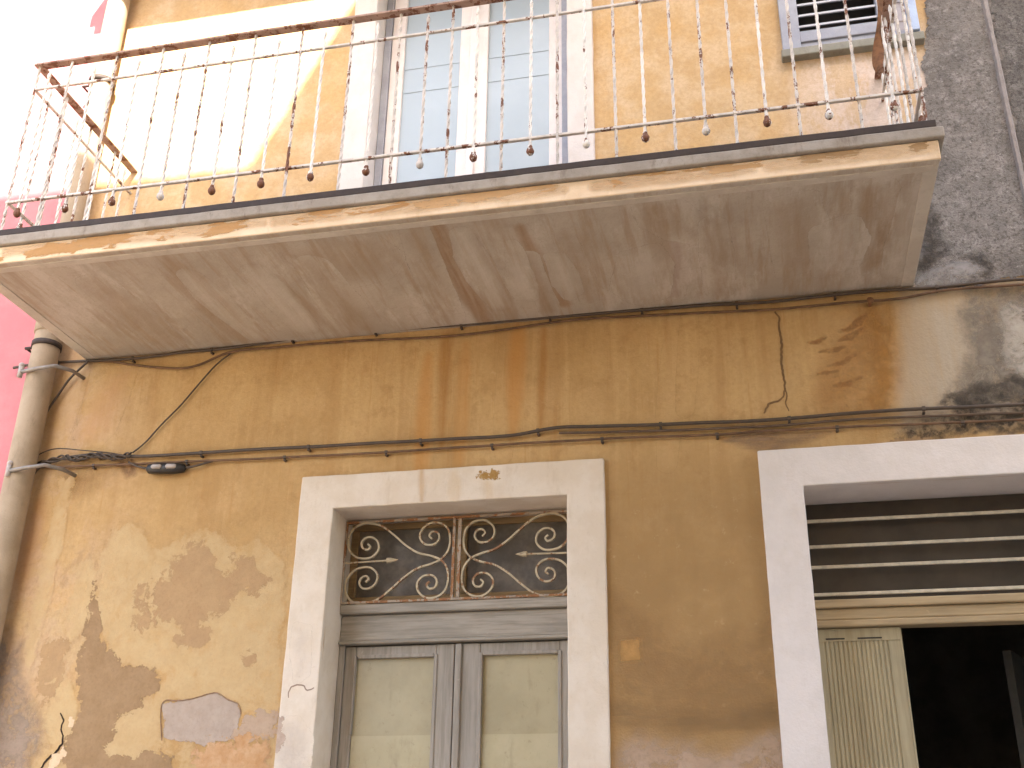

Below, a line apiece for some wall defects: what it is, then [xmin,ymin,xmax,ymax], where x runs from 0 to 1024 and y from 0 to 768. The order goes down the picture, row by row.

peeling [23,228,175,260]
peeling [197,219,248,238]
damp [762,178,1024,443]
crack [764,312,789,413]
peeling [72,363,139,451]
peeling [10,474,288,768]
crack [41,713,75,768]